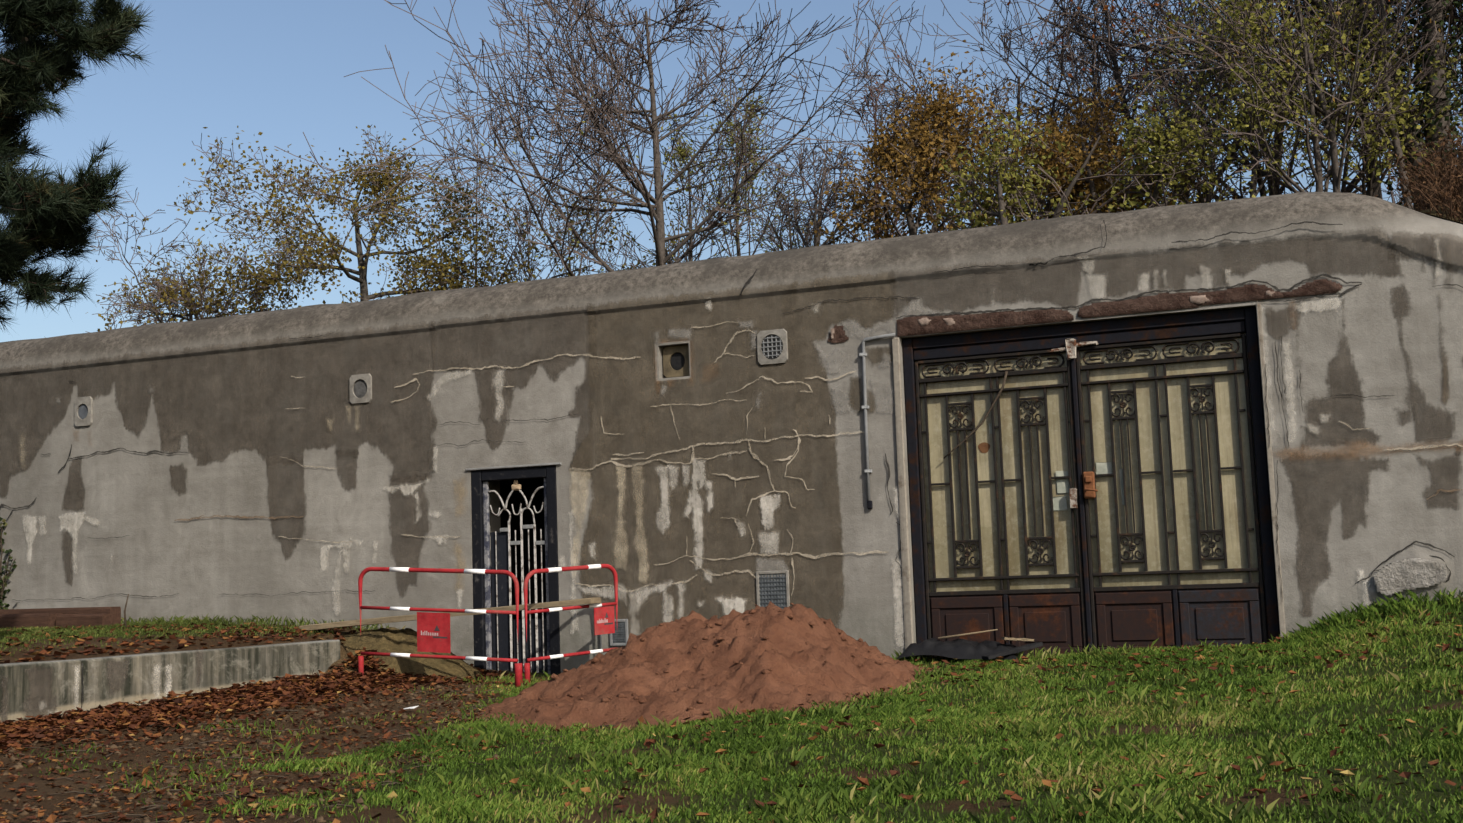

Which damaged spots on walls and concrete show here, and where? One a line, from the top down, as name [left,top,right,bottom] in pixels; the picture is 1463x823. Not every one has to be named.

crack [391,269,901,596]
damp [0,229,1463,645]
crack [787,220,1362,319]
crack [1265,338,1463,598]